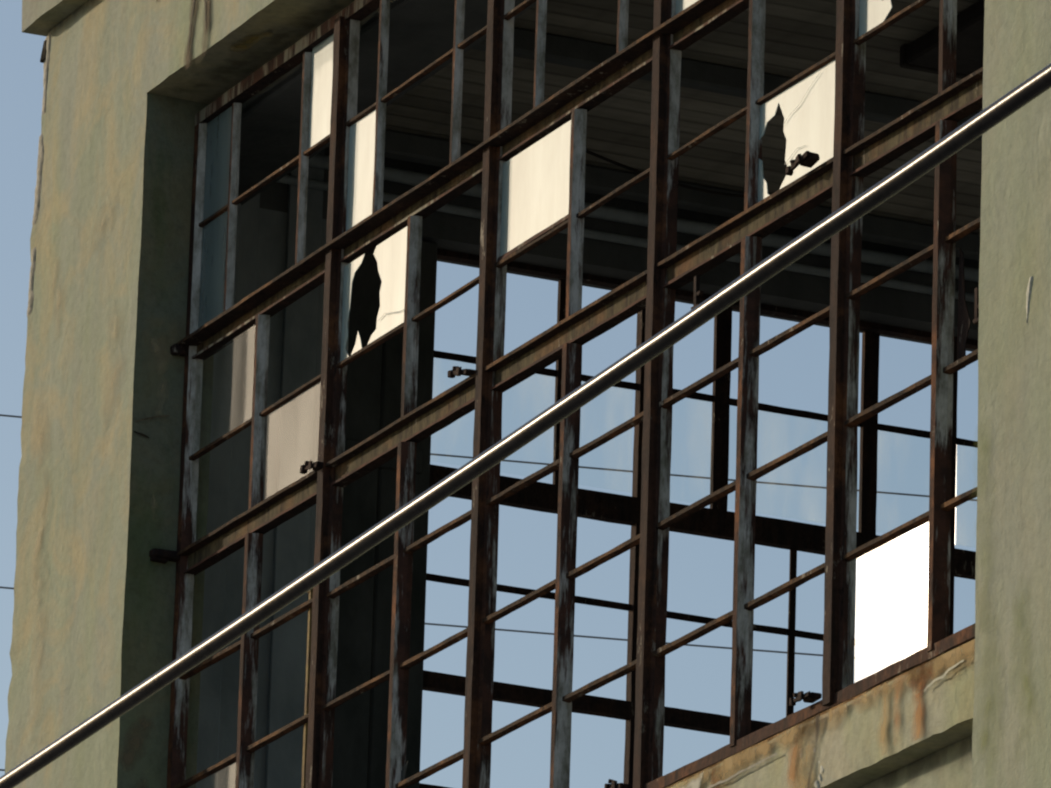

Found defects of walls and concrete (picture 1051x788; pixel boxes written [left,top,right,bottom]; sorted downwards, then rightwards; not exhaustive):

leakage [184,0,210,68]
corrosion [676,639,975,788]